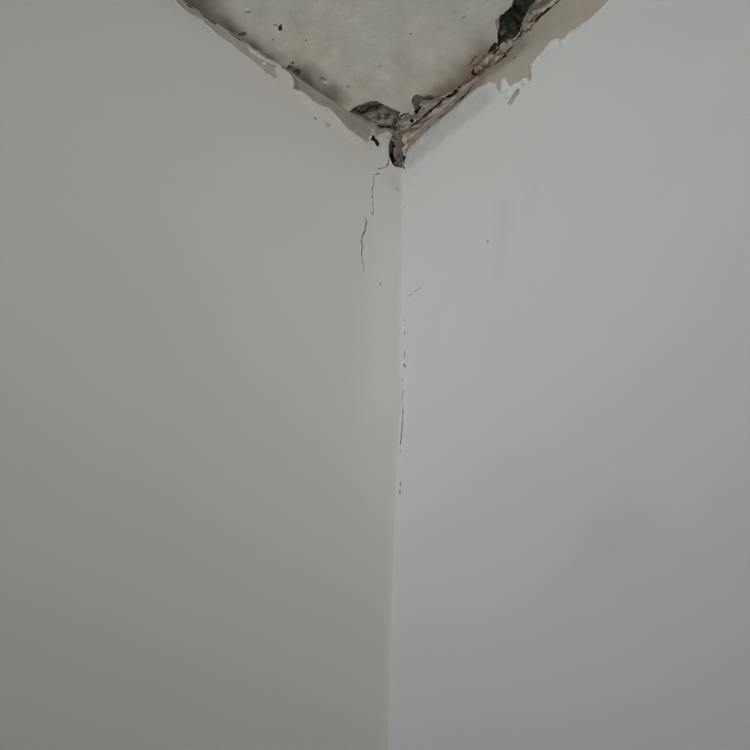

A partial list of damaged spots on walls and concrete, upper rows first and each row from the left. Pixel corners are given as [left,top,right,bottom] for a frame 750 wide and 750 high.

peeling [175,0,611,170]
crack [361,167,385,269]